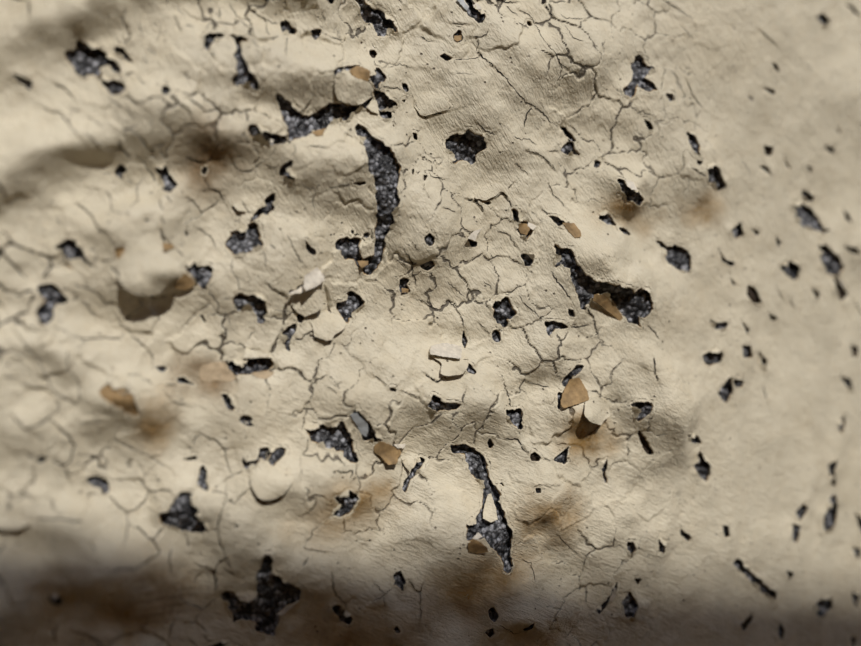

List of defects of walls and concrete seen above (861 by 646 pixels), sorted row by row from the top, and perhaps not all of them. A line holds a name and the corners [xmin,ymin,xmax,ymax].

spalling [60,33,137,100]
spalling [197,0,454,278]
crack [322,14,412,90]
crack [444,23,564,213]
crack [499,0,583,79]
crack [0,1,326,479]
peeling [151,238,367,430]
crack [396,242,489,333]
spalling [541,209,656,339]
spalling [155,452,213,538]
crack [101,433,290,591]
spalling [447,435,516,577]